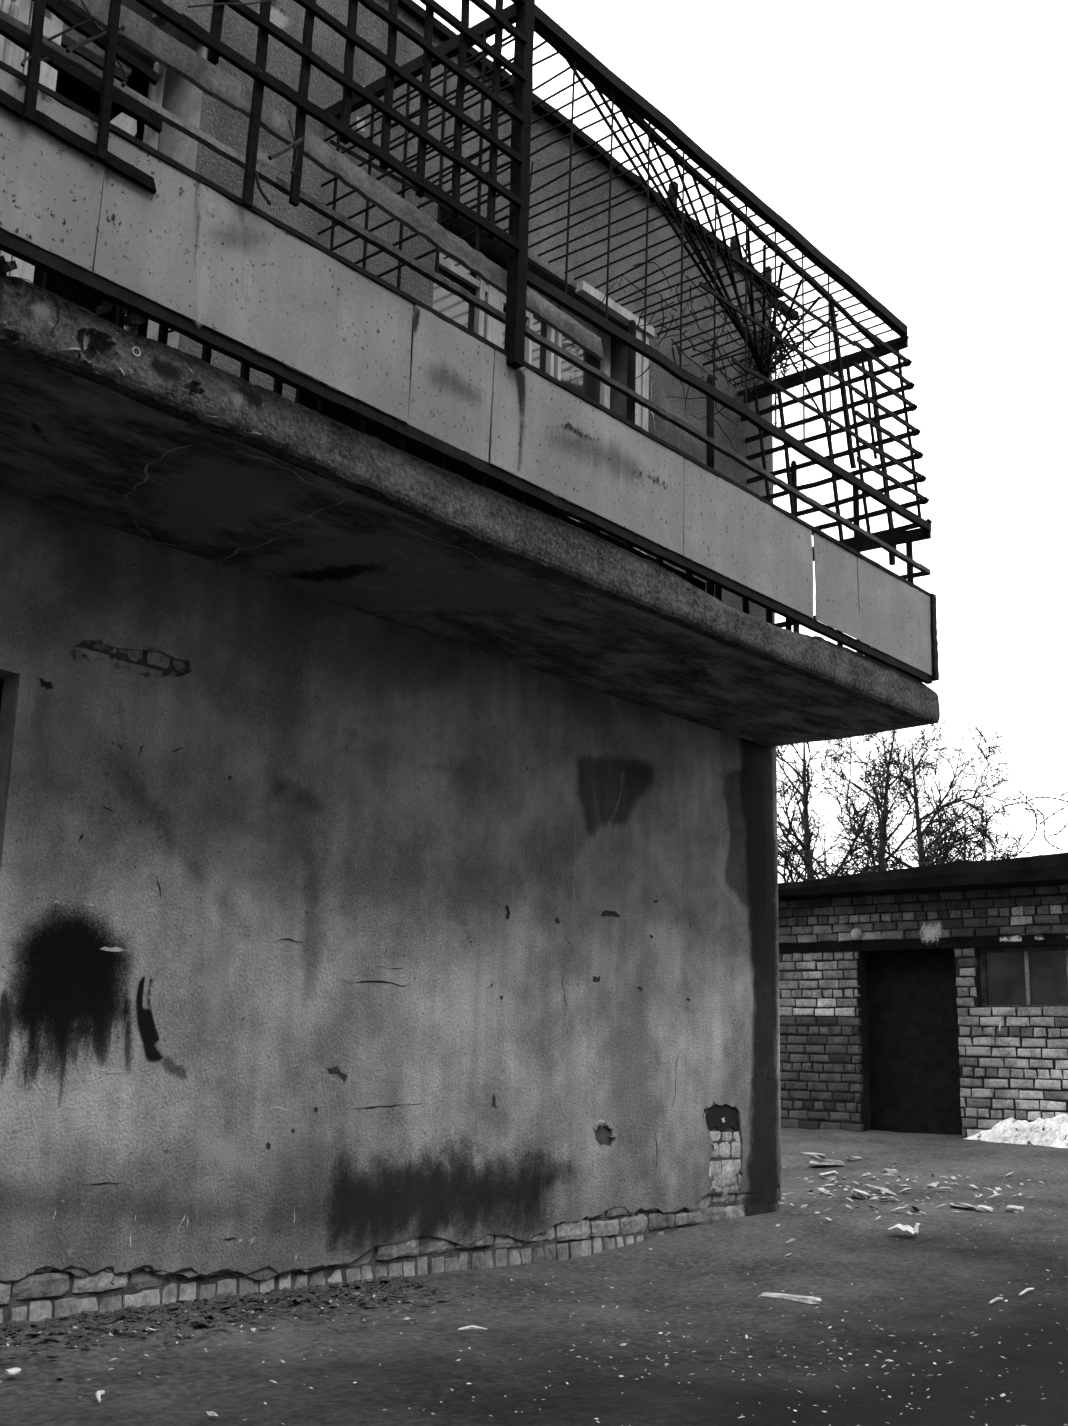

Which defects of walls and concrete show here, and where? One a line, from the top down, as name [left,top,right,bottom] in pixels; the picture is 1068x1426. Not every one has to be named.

spalling [79,328,114,375]